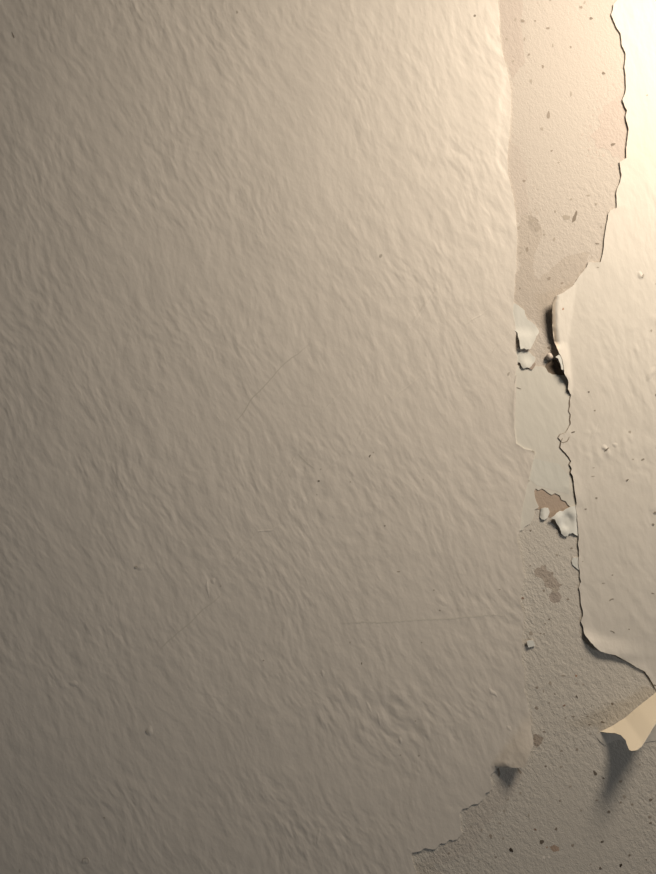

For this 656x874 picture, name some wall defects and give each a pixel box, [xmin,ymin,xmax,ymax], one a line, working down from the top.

flaking render [498,0,626,373]
crack [557,383,576,502]
flaking render [412,489,656,874]